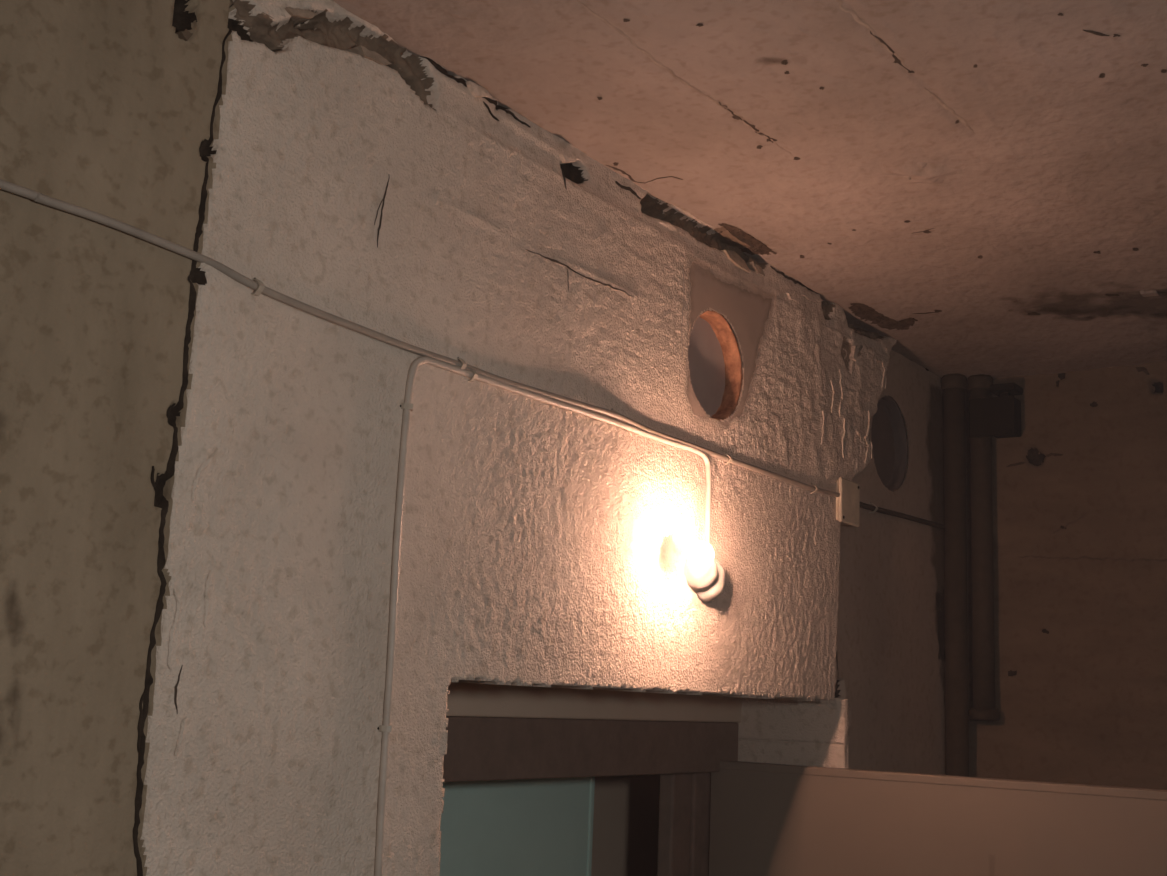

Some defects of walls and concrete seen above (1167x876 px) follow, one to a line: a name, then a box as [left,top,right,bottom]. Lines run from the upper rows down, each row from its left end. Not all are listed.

spalling [227,0,436,110]
crack [577,0,801,160]
crack [836,0,974,133]
spalling [559,153,588,190]
spalling [615,181,942,463]